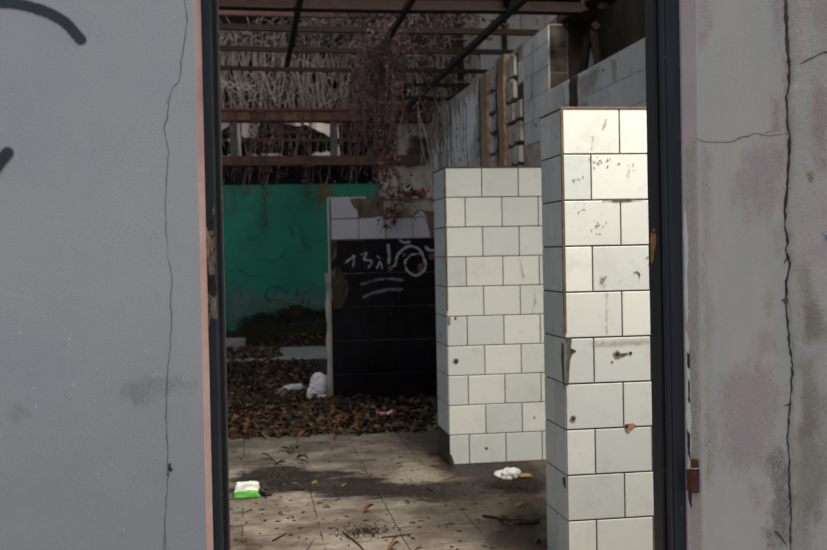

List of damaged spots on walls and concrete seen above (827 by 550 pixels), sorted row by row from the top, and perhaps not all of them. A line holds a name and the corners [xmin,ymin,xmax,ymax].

crack [163,0,188,550]
peeling [206,204,218,328]
spalling [331,242,347,309]
spalling [352,199,372,217]
spalling [384,194,435,237]
crack [695,0,827,550]